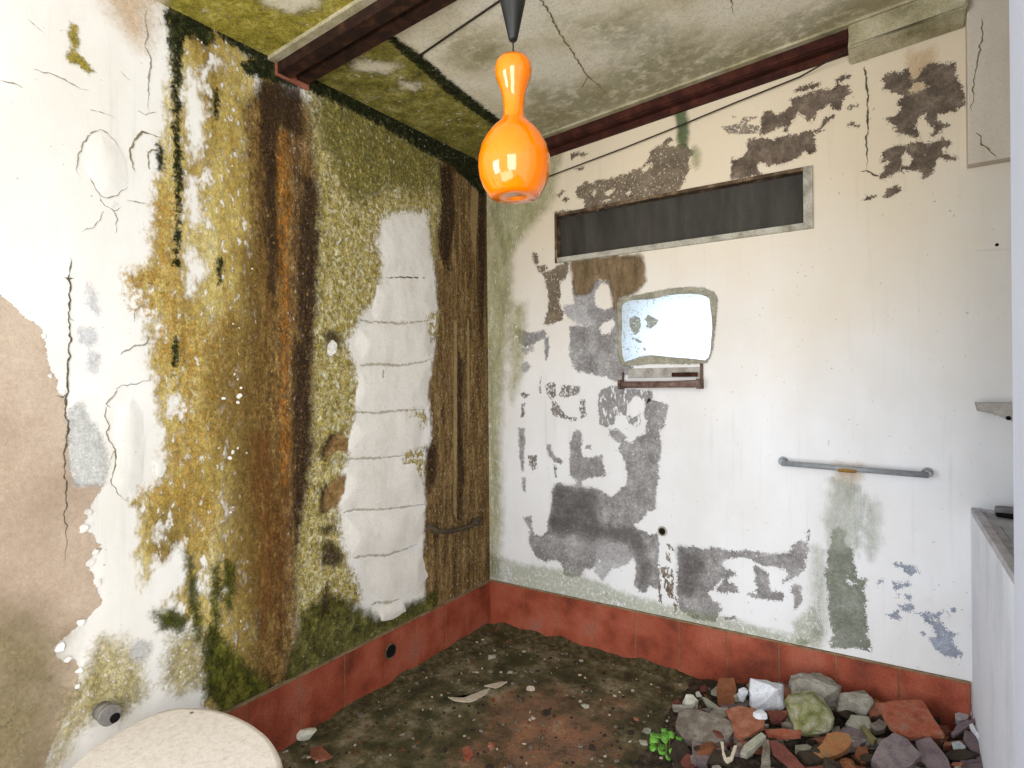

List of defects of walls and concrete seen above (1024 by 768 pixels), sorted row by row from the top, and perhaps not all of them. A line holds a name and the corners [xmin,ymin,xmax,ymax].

crack [1,8,159,232]
crack [540,0,607,94]
peeling [724,74,860,180]
crack [862,66,883,178]
peeling [864,61,966,201]
flaking render [0,295,108,768]
crack [56,257,74,558]
damp [124,80,326,696]
corrosion [257,131,293,605]
damp [404,155,557,606]
peeling [515,253,810,623]
peeling [823,527,963,660]